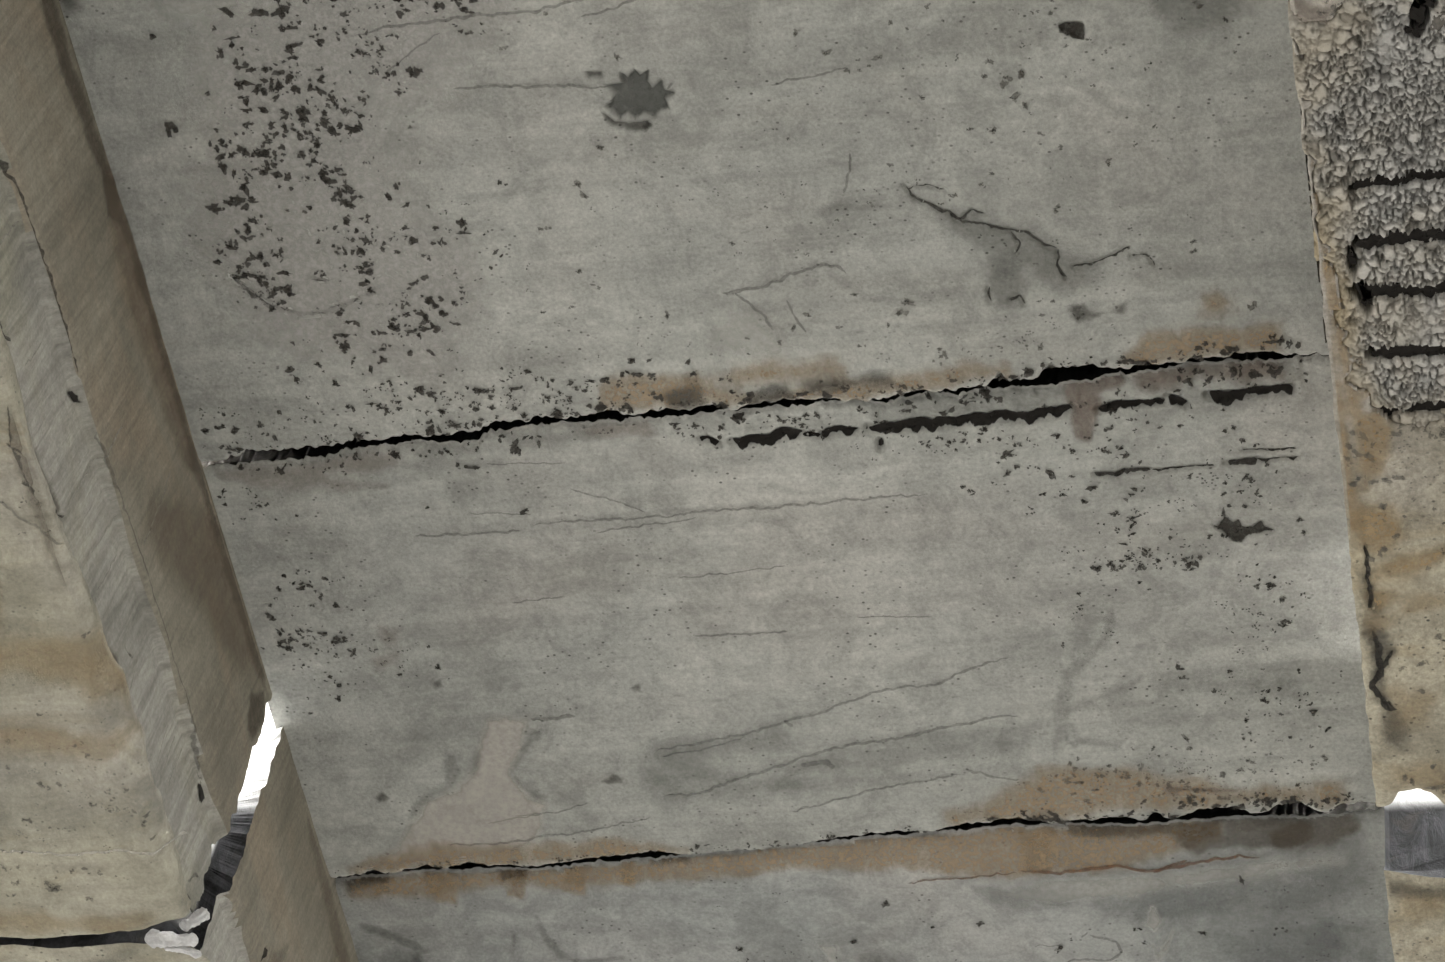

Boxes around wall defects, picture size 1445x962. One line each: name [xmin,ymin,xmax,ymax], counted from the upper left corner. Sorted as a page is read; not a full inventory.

spalling [164,122,178,138]
crack [907,184,1155,276]
spalling [188,0,1308,590]
crack [700,384,1293,450]
crack [1094,447,1297,476]
spalling [261,569,417,715]
spalling [1214,563,1309,654]
crack [1363,546,1396,711]
corrosion [952,770,1221,823]
spalling [984,687,1354,825]
corrosion [363,841,663,871]
crack [912,854,1258,884]